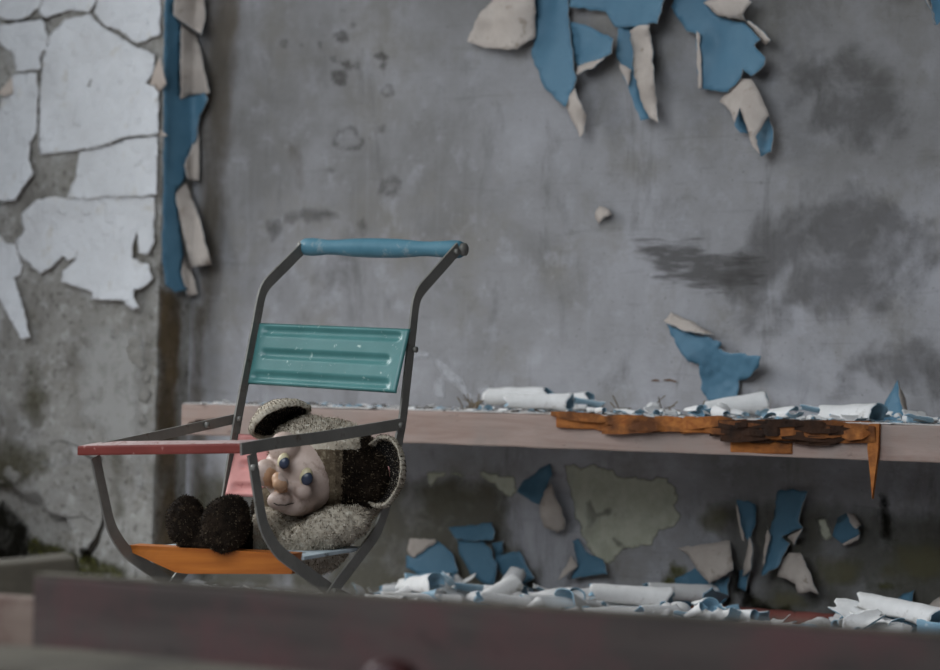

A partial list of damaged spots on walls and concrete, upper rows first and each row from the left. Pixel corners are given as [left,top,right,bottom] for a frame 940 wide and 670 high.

peeling [467,0,774,156]
peeling [0,0,212,339]
peeling [664,312,934,423]
crack [56,516,104,555]
flaking render [352,464,819,620]
peeling [819,512,861,546]
peeling [806,590,940,631]